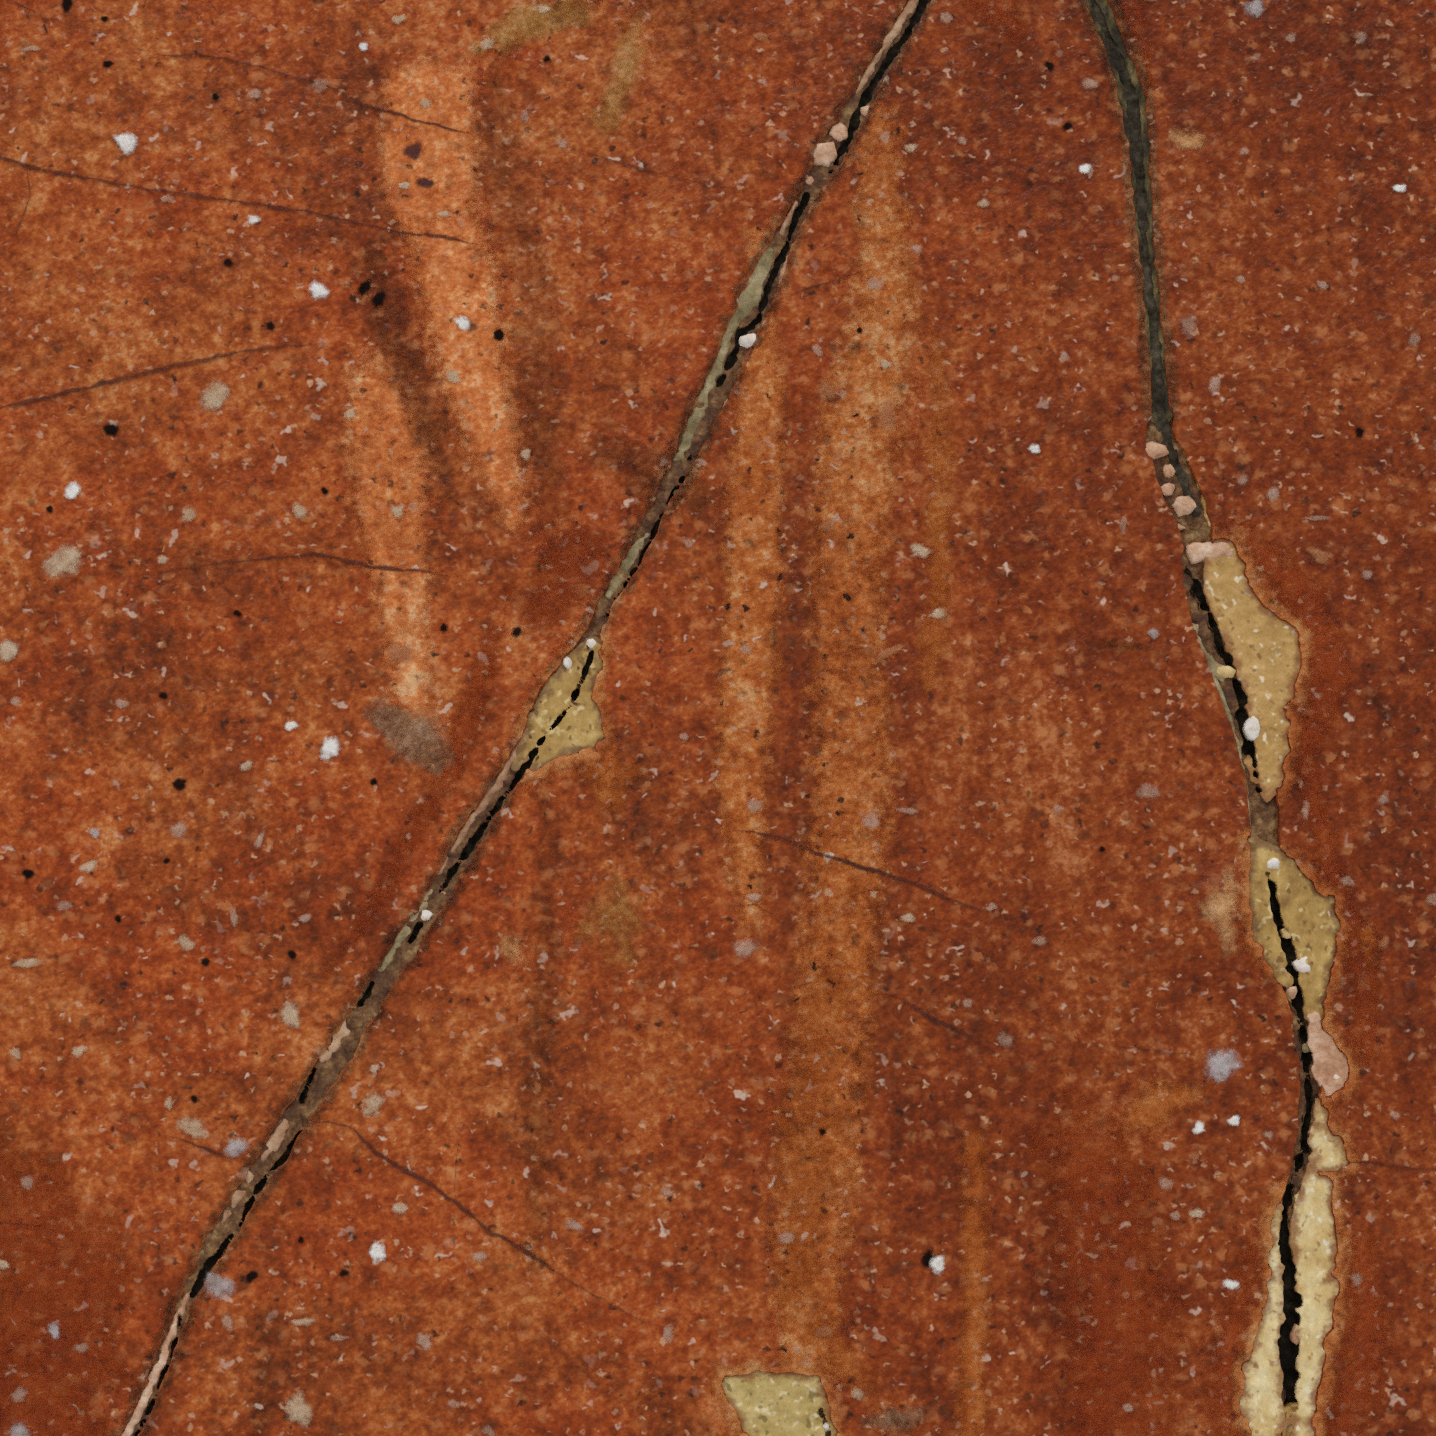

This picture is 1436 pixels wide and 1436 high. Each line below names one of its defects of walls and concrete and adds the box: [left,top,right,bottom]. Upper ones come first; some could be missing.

crack [111,0,936,1436]
spalling [503,632,615,781]
corrosion [583,744,646,809]
crack [735,830,1000,916]
crack [1080,0,1319,1436]
spalling [1203,530,1311,805]
corrosion [0,1152,130,1436]
spalling [712,1360,844,1436]
crack [874,993,1002,1057]
corrosion [955,1133,989,1436]
corrosion [1029,1083,1202,1436]
spalling [1233,828,1359,1436]